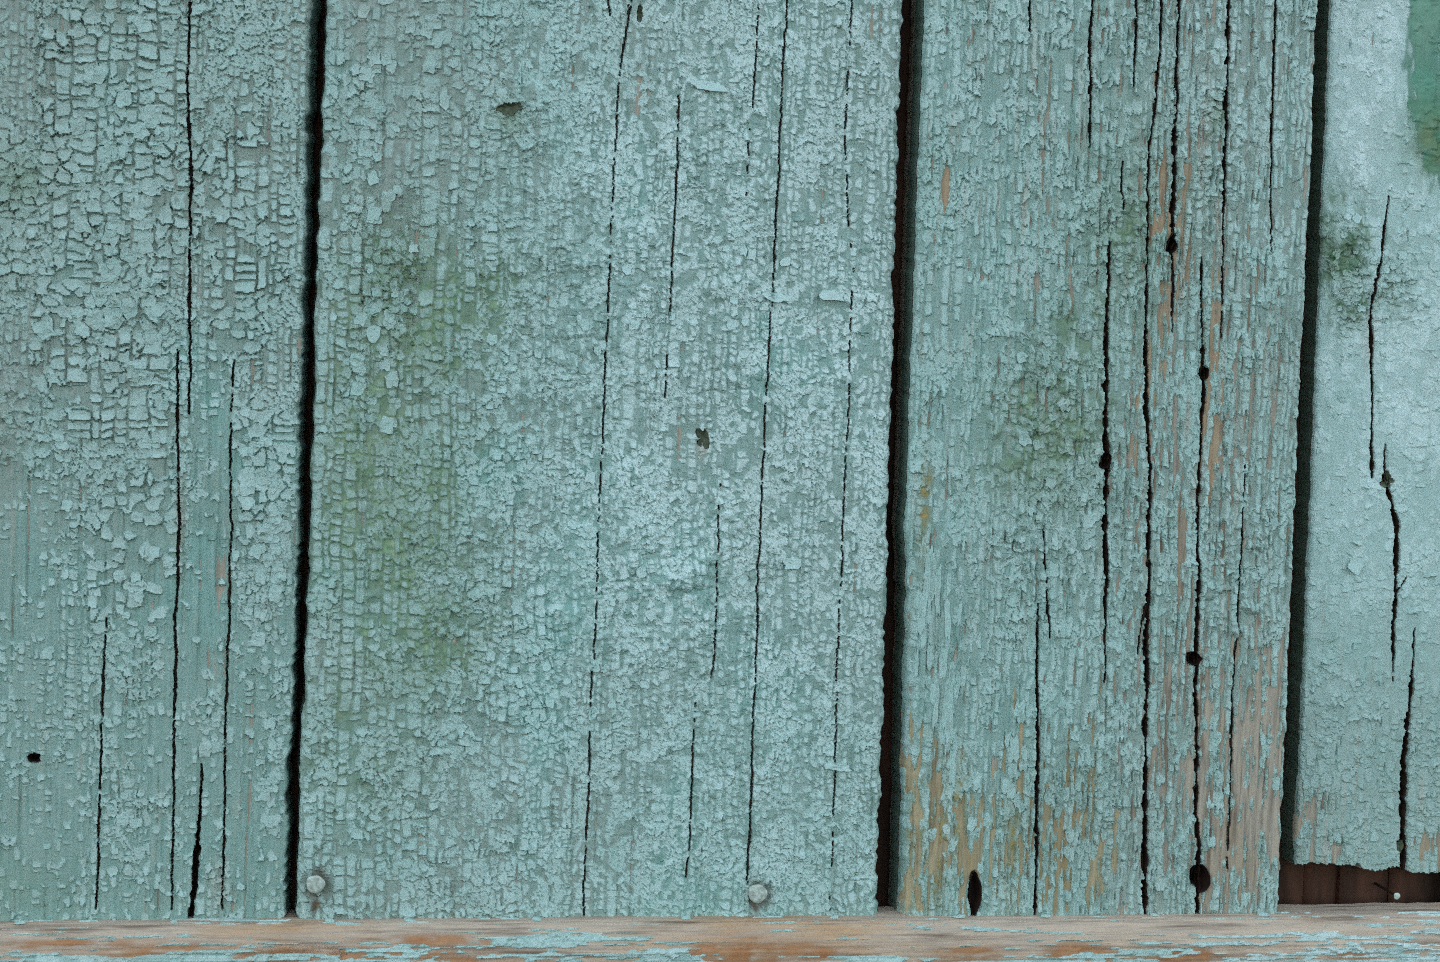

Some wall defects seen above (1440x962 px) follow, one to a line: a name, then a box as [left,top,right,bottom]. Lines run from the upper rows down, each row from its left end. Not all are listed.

crack [96,617,107,906]
crack [171,2,234,917]
peeling [941,160,956,213]
peeling [896,535,1119,916]
crack [1032,525,1050,915]
crack [1086,0,1094,146]
peeling [1019,123,1192,529]
crack [1101,0,1245,914]
peeling [1191,266,1227,505]
peeling [1183,613,1342,914]
crack [1368,196,1414,871]
damp [1407,0,1440,184]